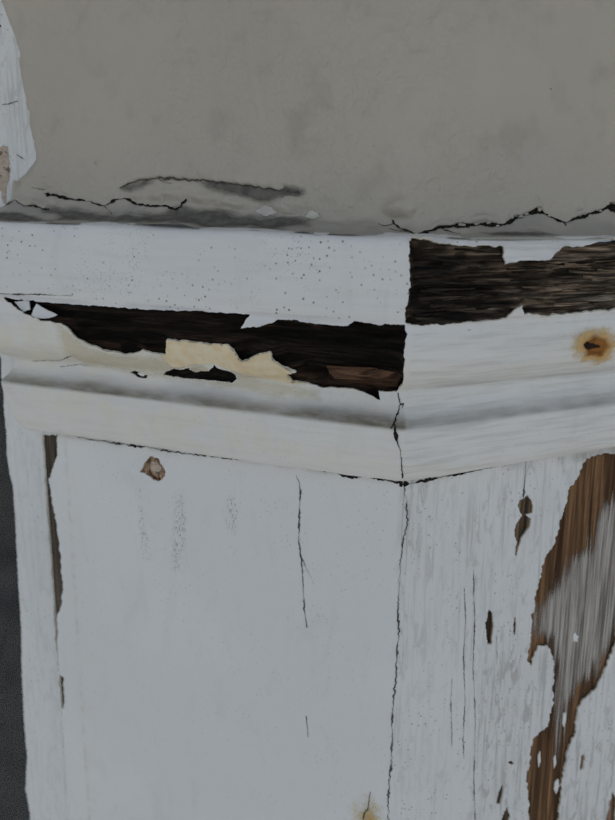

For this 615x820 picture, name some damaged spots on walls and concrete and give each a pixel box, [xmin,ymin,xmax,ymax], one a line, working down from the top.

crack [6,150,300,215]
crack [378,183,615,234]
peeling [15,300,57,319]
peeling [161,340,307,384]
rust [576,330,615,362]
spalling [141,456,165,481]
crack [78,437,237,460]
peeling [44,435,63,614]
crack [297,479,313,627]
peeling [514,496,532,555]
crack [323,393,526,820]
peeling [526,453,615,820]